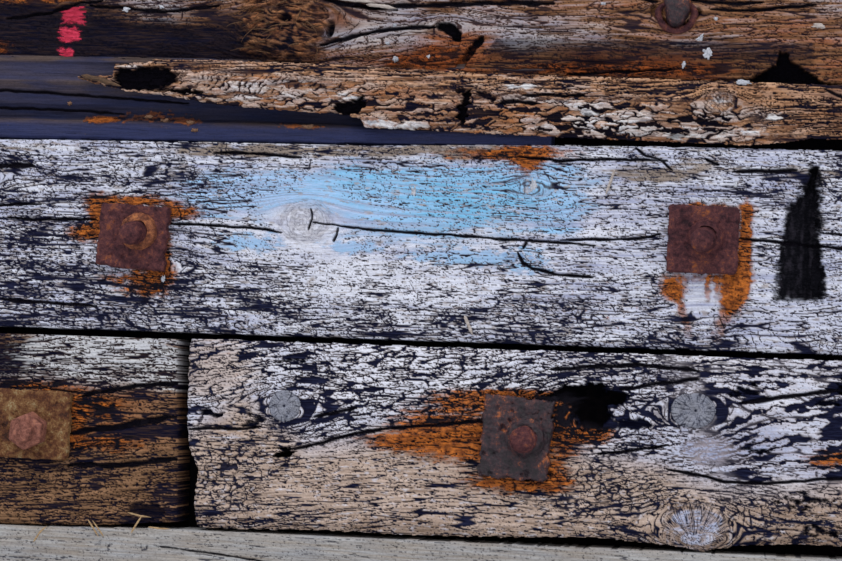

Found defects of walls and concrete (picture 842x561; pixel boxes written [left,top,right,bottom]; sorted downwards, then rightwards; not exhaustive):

crack [321,0,555,46]
corrosion [445,145,573,172]
corrosion [70,191,197,243]
corrosion [106,233,177,297]
crack [170,223,282,233]
crack [308,209,660,278]
corrosion [705,202,755,316]
crack [739,233,842,251]
corrosion [660,274,688,315]
crack [313,407,357,417]
crack [285,420,483,451]
corrosion [364,389,616,495]